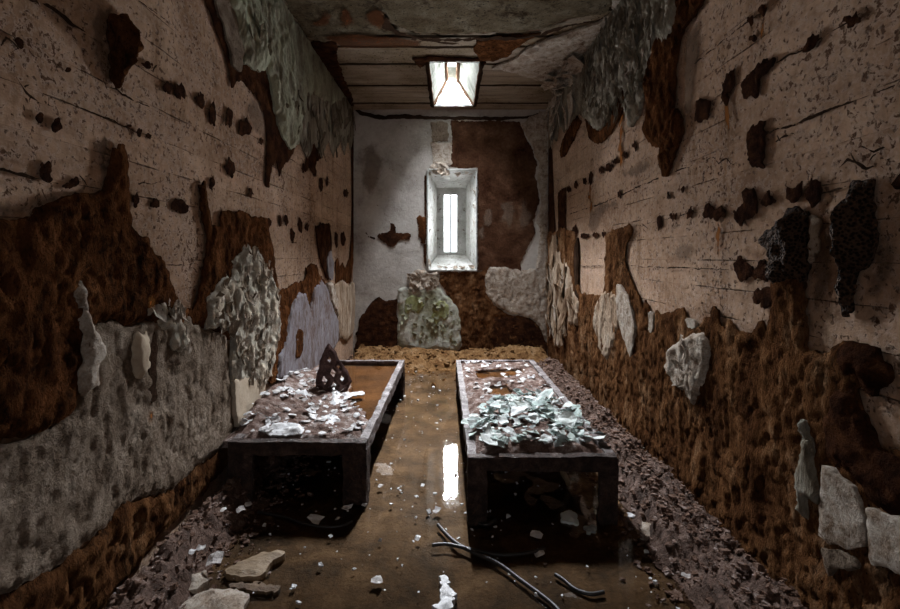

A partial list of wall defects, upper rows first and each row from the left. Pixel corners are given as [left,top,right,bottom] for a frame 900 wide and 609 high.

crack [29,0,85,32]
peeling [205,0,399,188]
crack [766,81,900,142]
peeling [0,144,366,594]
spalling [354,0,900,609]